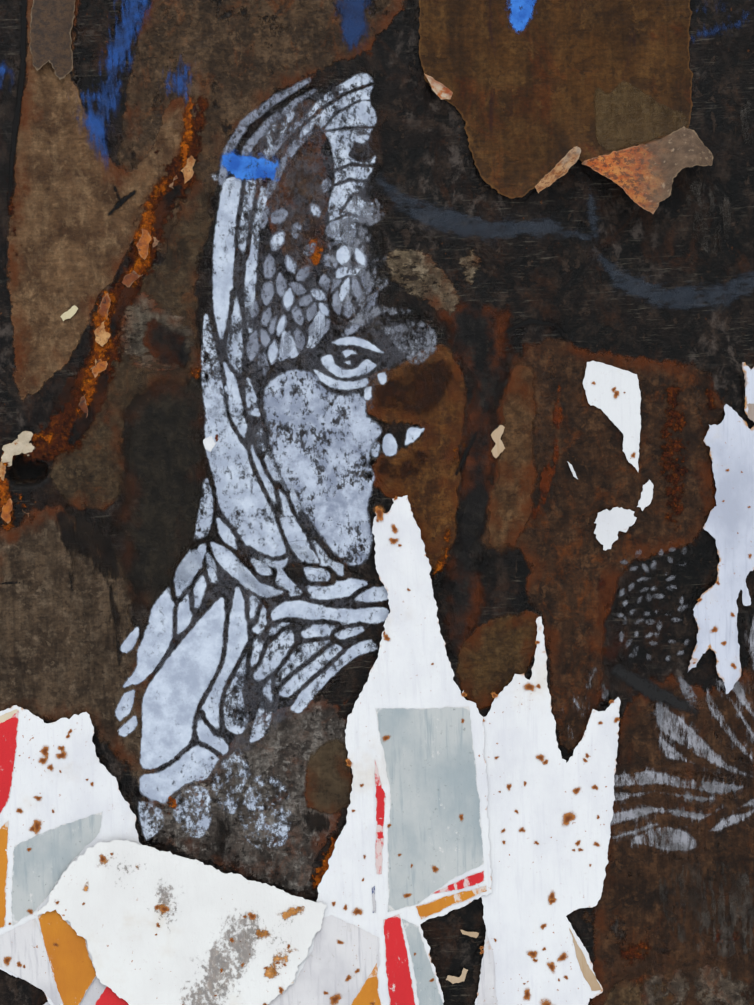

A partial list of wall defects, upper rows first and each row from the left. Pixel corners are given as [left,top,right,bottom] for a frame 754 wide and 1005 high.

peeling [425,74,453,100]
peeling [535,126,713,214]